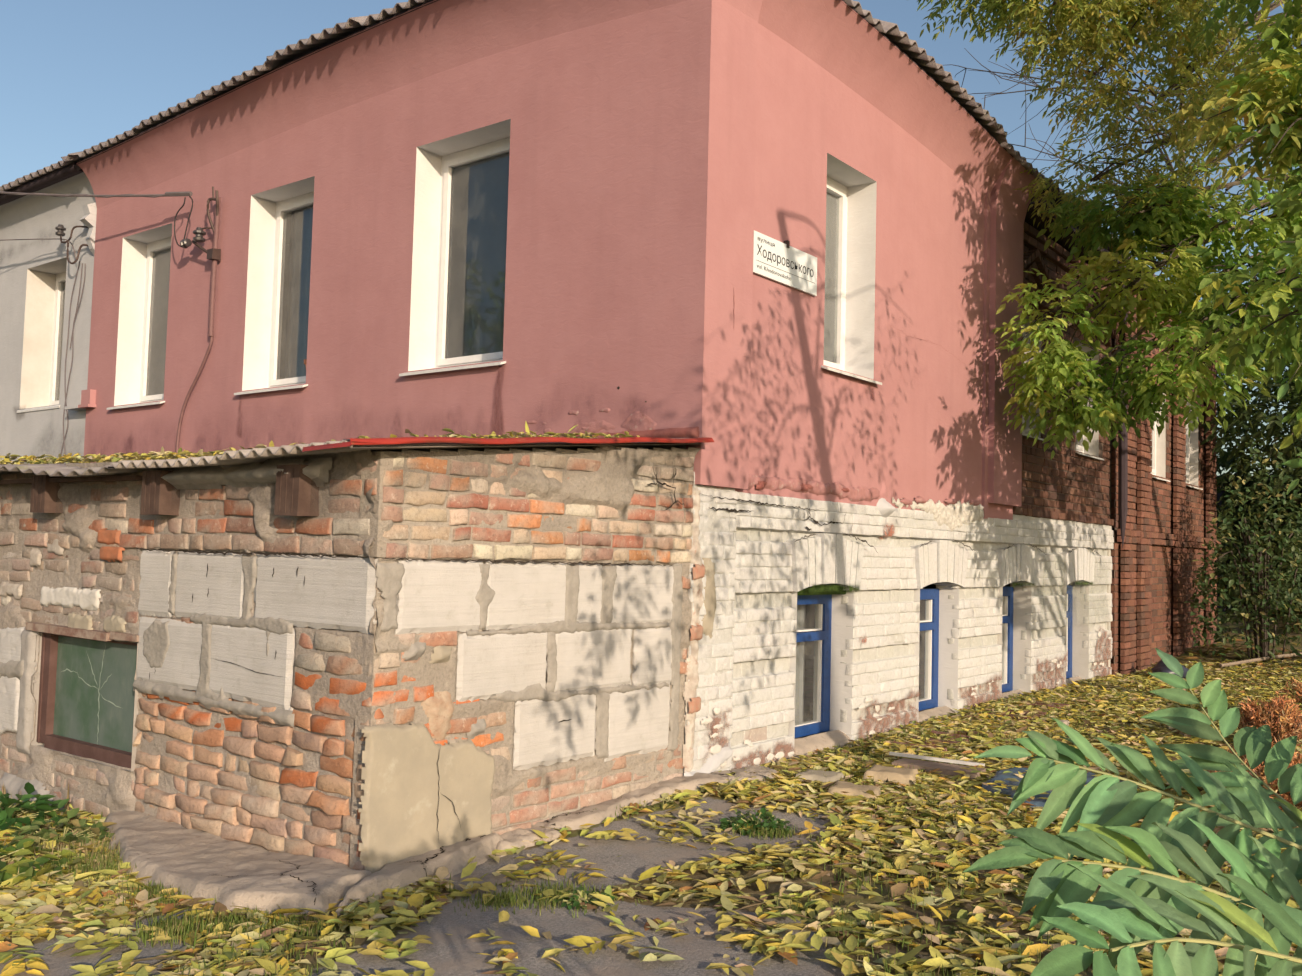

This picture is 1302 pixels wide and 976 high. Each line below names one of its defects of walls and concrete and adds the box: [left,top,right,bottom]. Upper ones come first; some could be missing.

leakage [491,371,503,436]
crack [647,463,878,553]
crack [436,743,486,841]